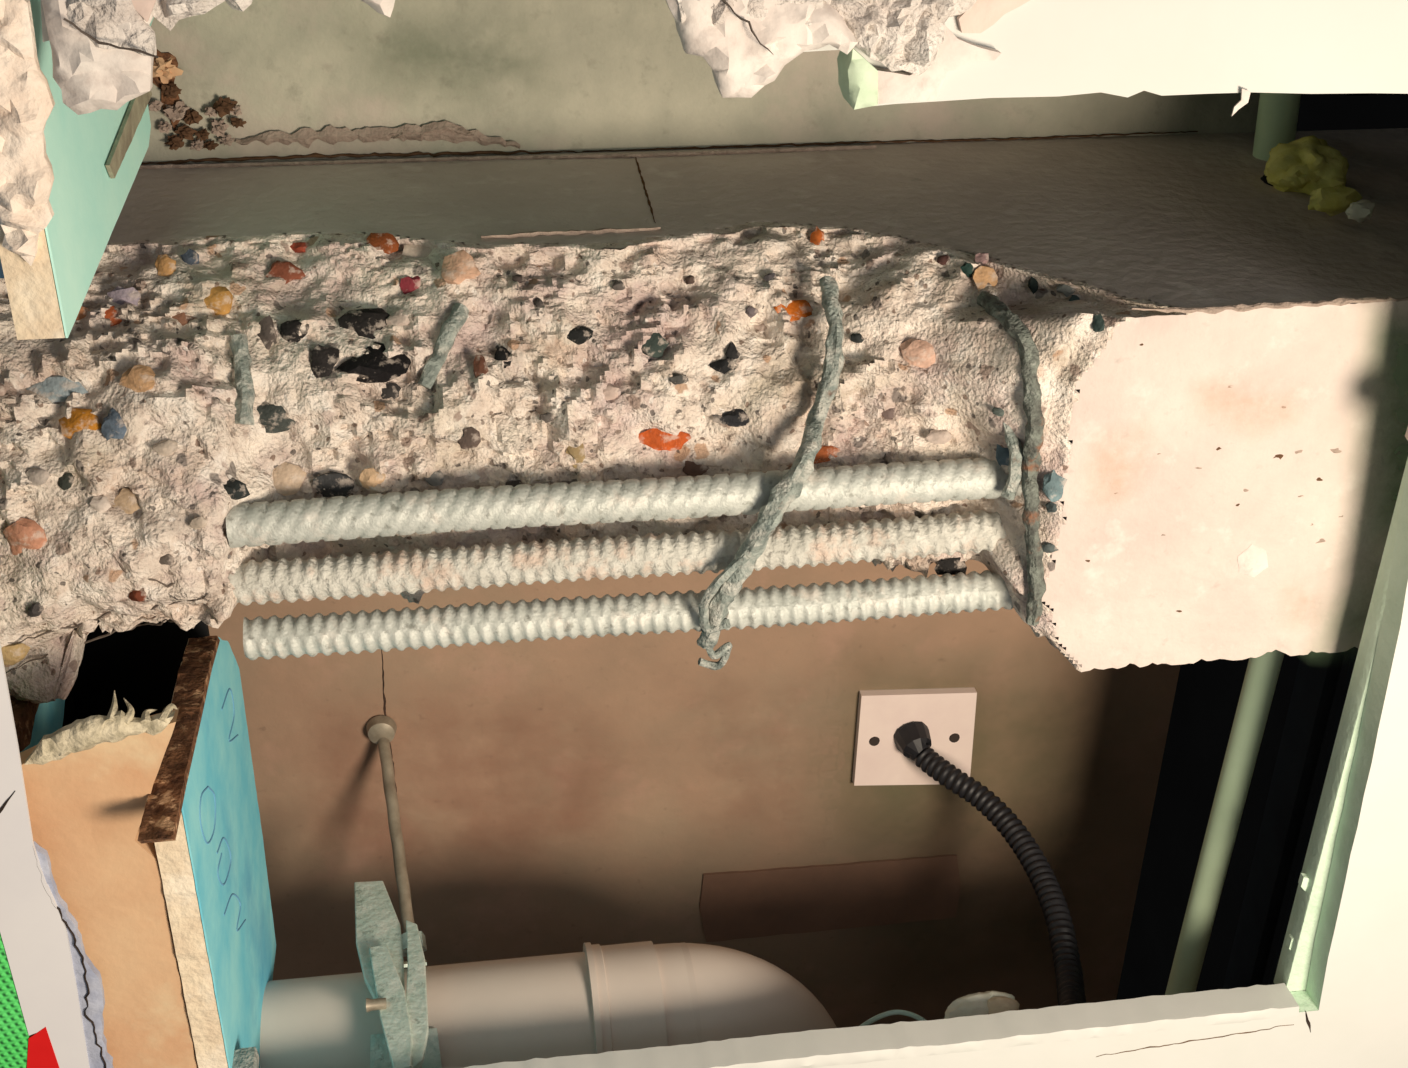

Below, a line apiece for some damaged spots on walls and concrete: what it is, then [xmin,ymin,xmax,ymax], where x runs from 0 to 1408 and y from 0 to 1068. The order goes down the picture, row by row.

flaking render [41,0,253,151]
flaking render [361,0,395,17]
flaking render [666,0,1030,110]
flaking render [1231,88,1251,116]
spalling [0,222,1408,704]
flaking render [1298,873,1309,892]